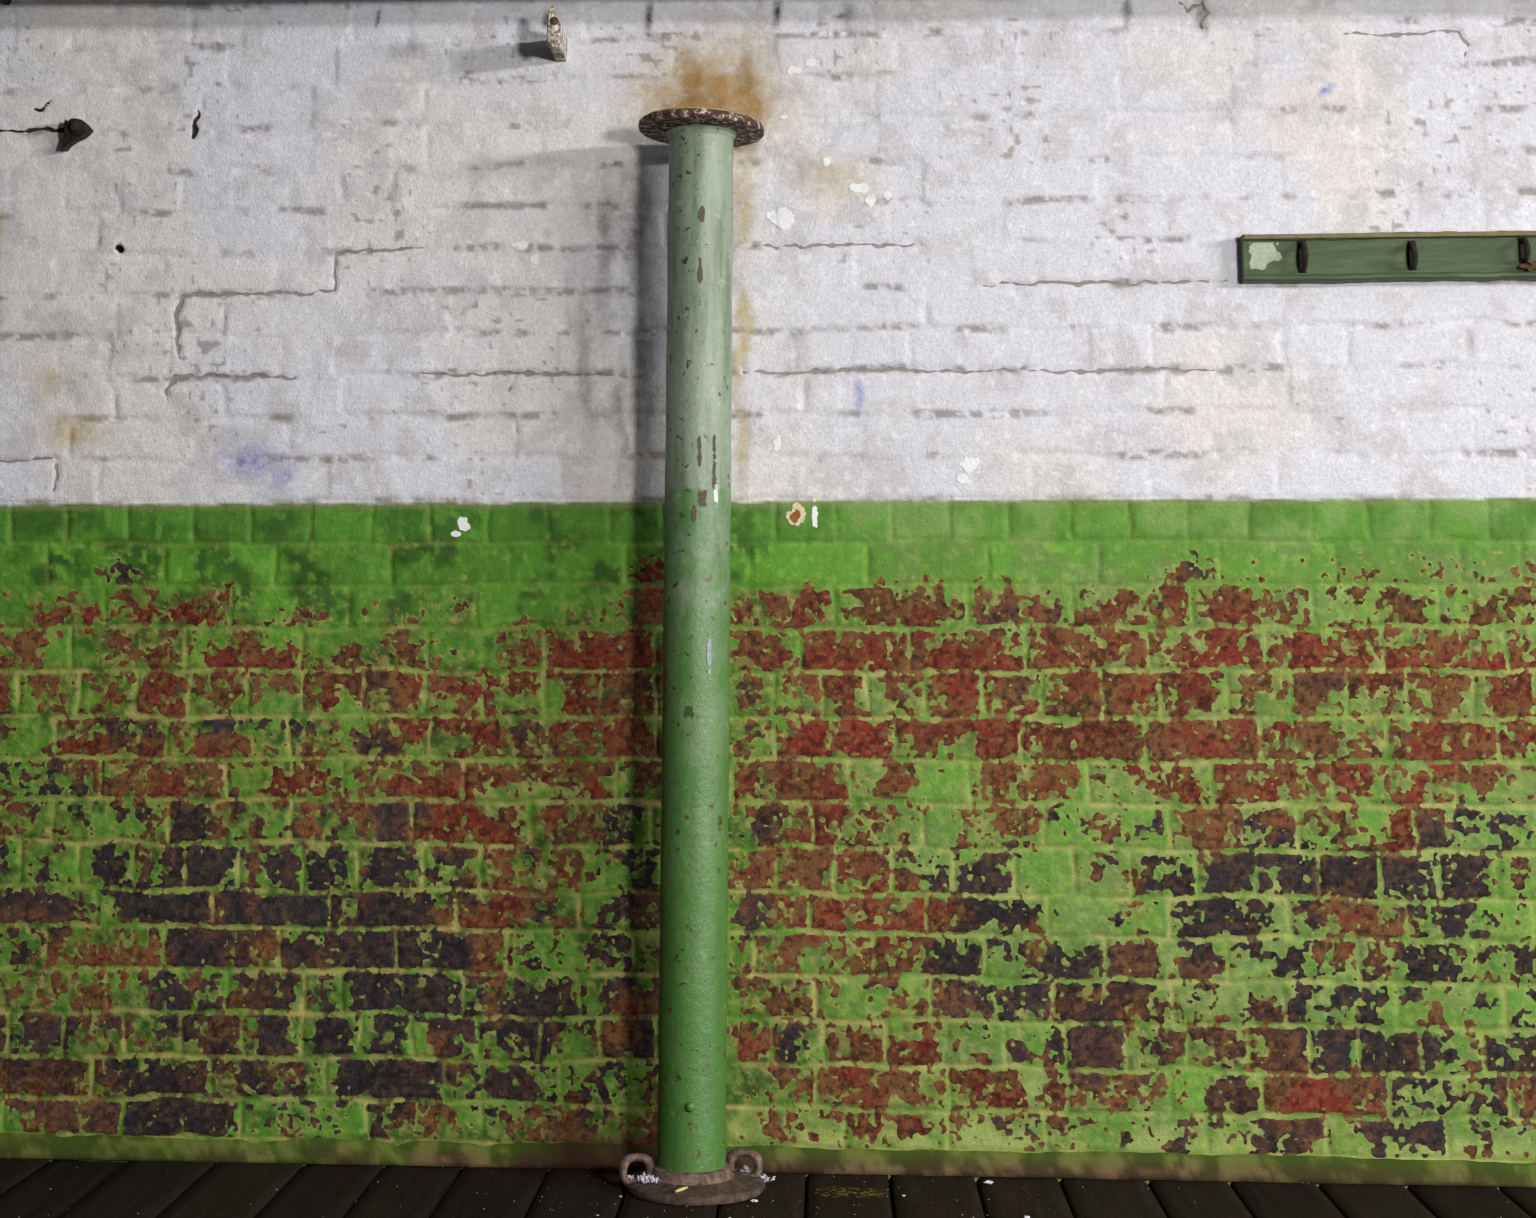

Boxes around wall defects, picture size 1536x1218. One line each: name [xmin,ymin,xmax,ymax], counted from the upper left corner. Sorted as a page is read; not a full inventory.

crack [0,101,64,133]
corrosion [665,63,762,118]
peeling [0,550,664,1145]
peeling [727,549,1536,1159]